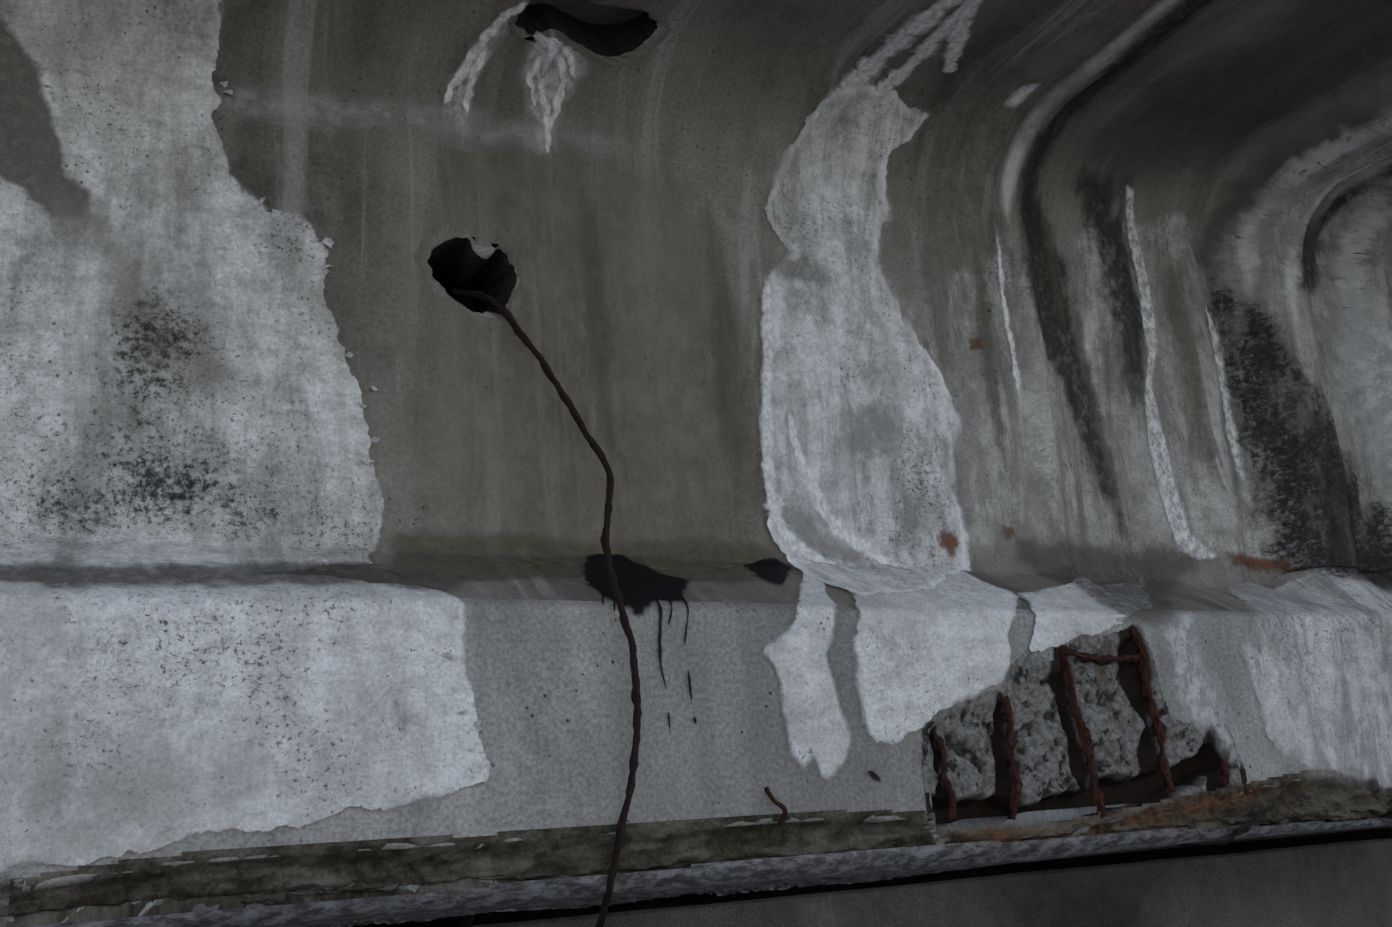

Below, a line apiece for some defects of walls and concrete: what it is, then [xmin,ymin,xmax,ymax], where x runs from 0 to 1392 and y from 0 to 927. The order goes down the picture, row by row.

water stain [0,21,105,234]
water stain [444,2,526,123]
water stain [526,31,582,153]
spalling [501,0,672,68]
water stain [5,275,359,545]
peeling [0,0,617,927]
water stain [454,177,722,542]
water stain [744,0,1392,596]
water stain [0,542,459,696]
water stain [583,553,689,690]
spalling [617,568,1392,874]
crack [1179,807,1273,846]